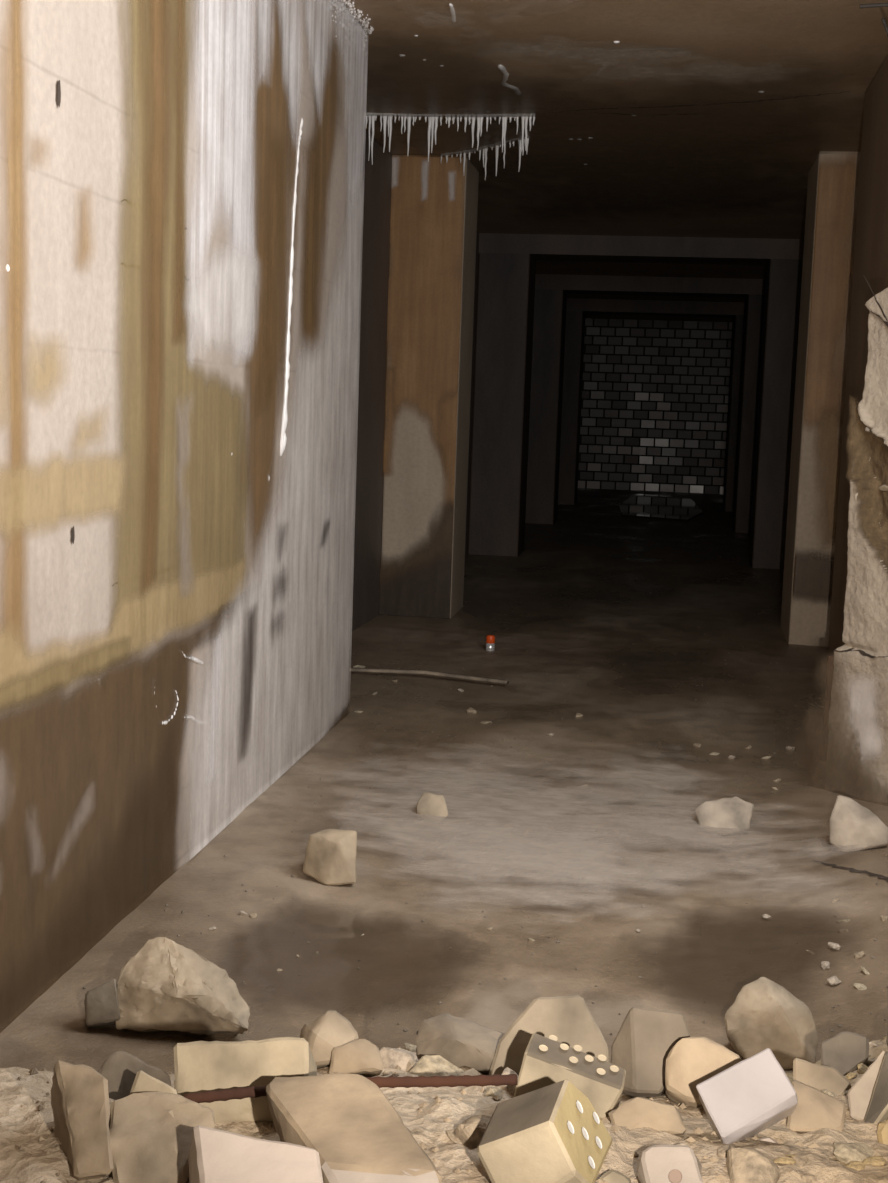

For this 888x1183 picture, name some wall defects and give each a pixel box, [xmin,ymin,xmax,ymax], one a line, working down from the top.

leakage [388,65,845,212]
crack [863,275,888,327]
leakage [0,0,374,1033]
leakage [379,505,454,619]
leakage [792,553,834,601]
spalling [848,398,888,575]
leakage [336,754,818,904]
crack [813,860,888,882]